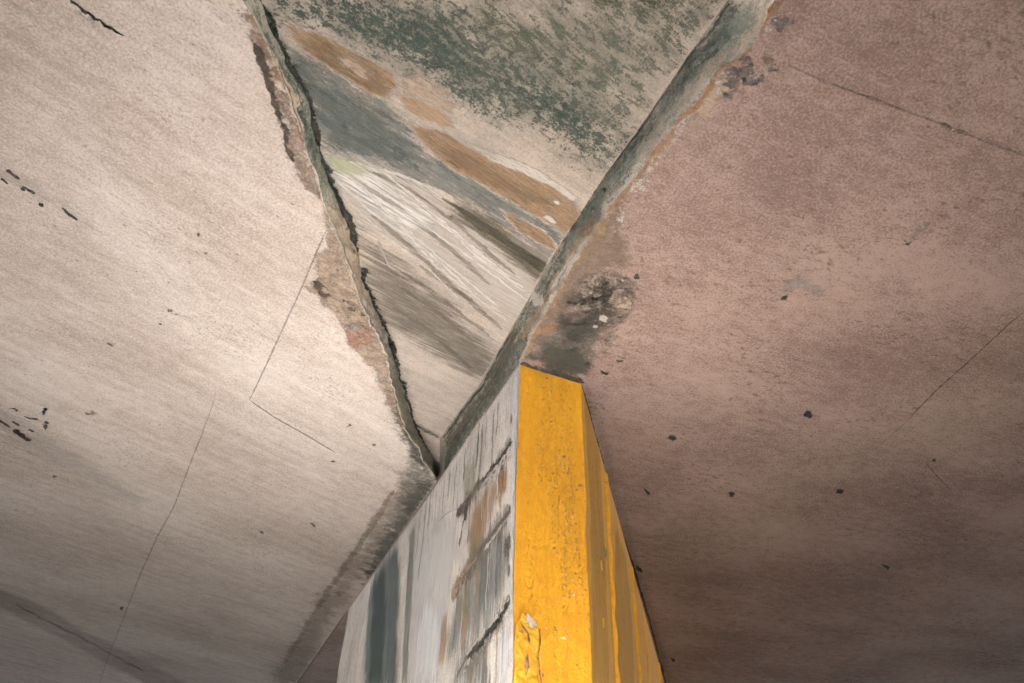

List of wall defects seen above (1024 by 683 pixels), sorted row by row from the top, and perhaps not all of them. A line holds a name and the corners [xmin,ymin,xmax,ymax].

crack [70,0,124,36]
peeling [765,15,794,32]
peeling [629,56,778,193]
crack [789,65,1024,156]
spalling [237,0,404,428]
crack [251,0,439,453]
damp [294,2,747,683]
spalling [557,270,638,344]